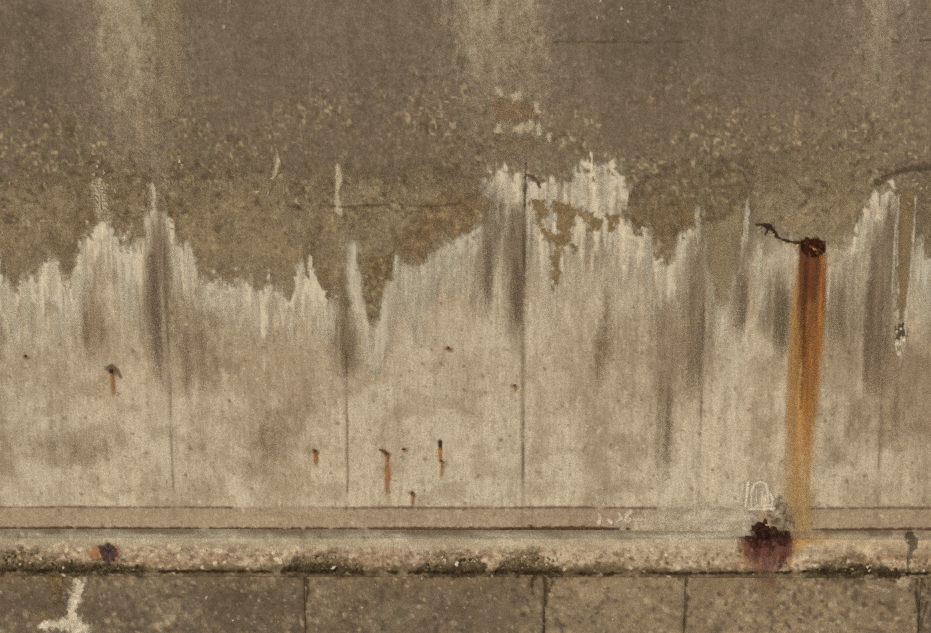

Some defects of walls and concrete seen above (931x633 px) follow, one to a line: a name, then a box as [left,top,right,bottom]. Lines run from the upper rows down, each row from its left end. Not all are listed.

water stain [431,0,566,135]
water stain [0,183,355,366]
water stain [391,136,791,424]
water stain [823,177,901,394]
water stain [911,238,931,330]
corrosion [105,364,121,392]
corrosion [379,449,390,492]
corrosion [739,237,825,571]